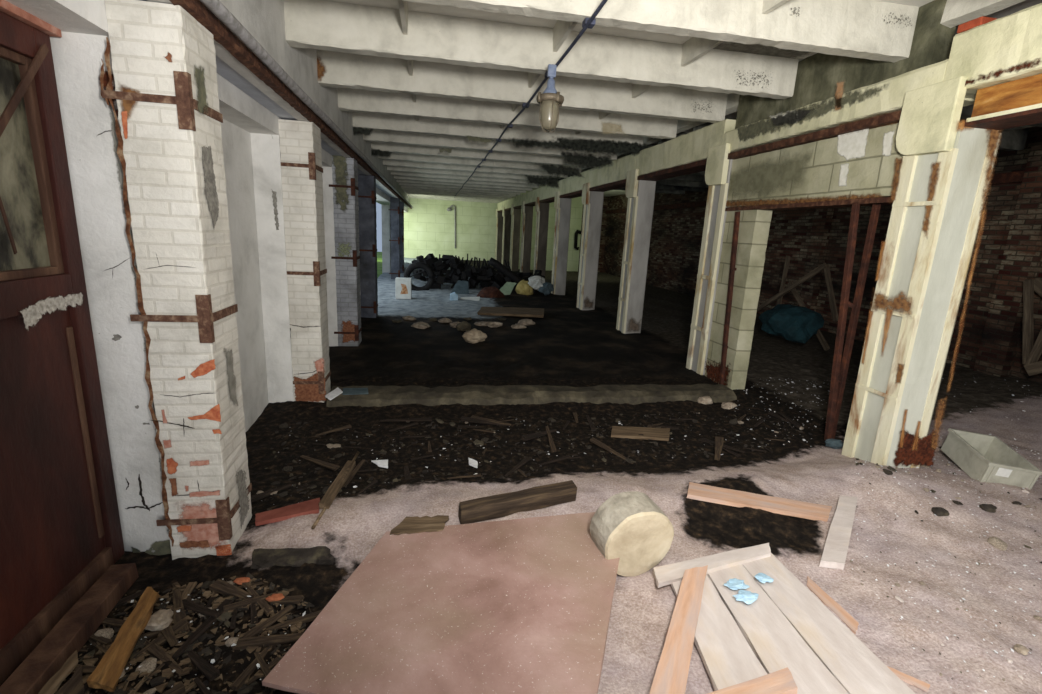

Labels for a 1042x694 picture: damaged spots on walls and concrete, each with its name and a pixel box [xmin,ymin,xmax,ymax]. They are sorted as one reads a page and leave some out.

rust [99,71,140,139]
peeling [194,66,208,114]
rust [965,59,1040,85]
peeling [202,146,219,228]
rust [894,129,1000,467]
peeling [178,348,238,434]
flaking render [294,358,327,402]
crack [125,474,214,511]
flaking render [163,440,220,497]
flaking render [131,525,232,556]